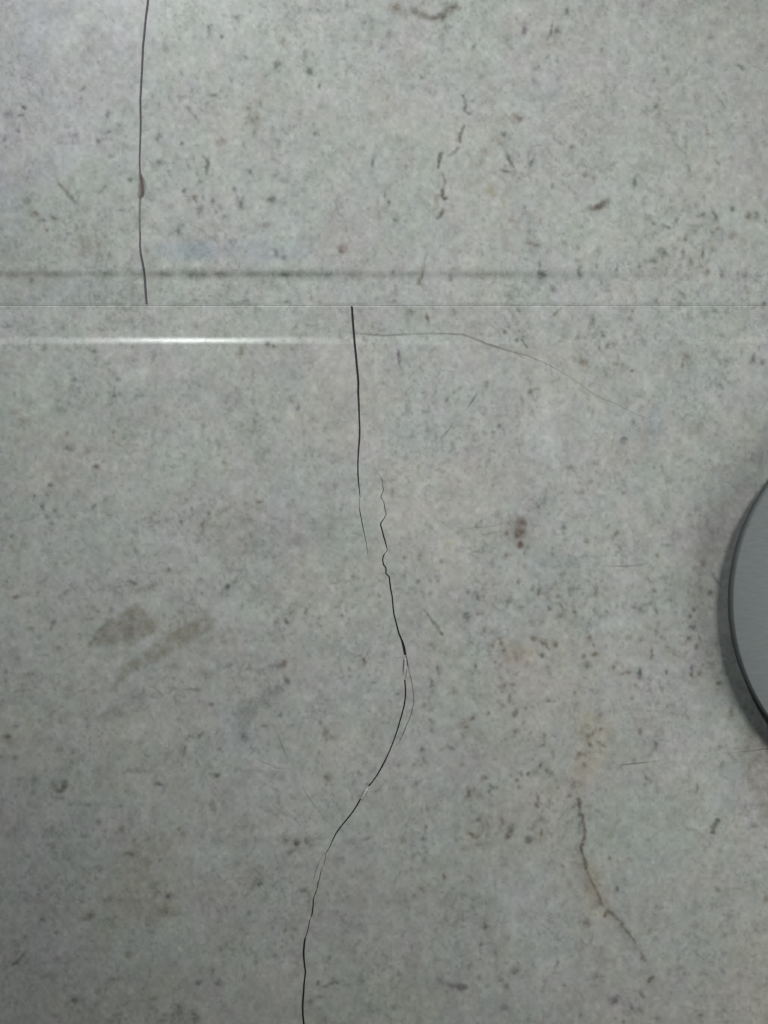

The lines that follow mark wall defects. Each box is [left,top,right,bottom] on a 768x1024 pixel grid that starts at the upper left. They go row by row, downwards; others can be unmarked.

crack [138,0,149,305]
crack [302,306,414,1024]